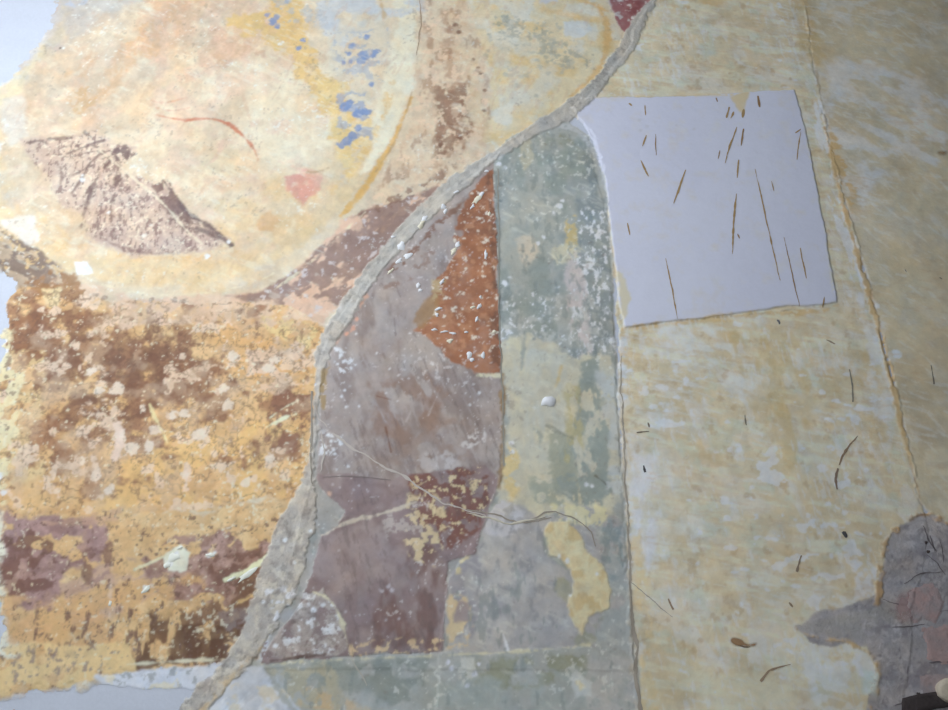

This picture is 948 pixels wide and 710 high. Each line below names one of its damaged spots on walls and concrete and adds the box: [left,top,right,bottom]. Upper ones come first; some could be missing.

crack [309,391,596,546]
peeling [597,0,948,710]